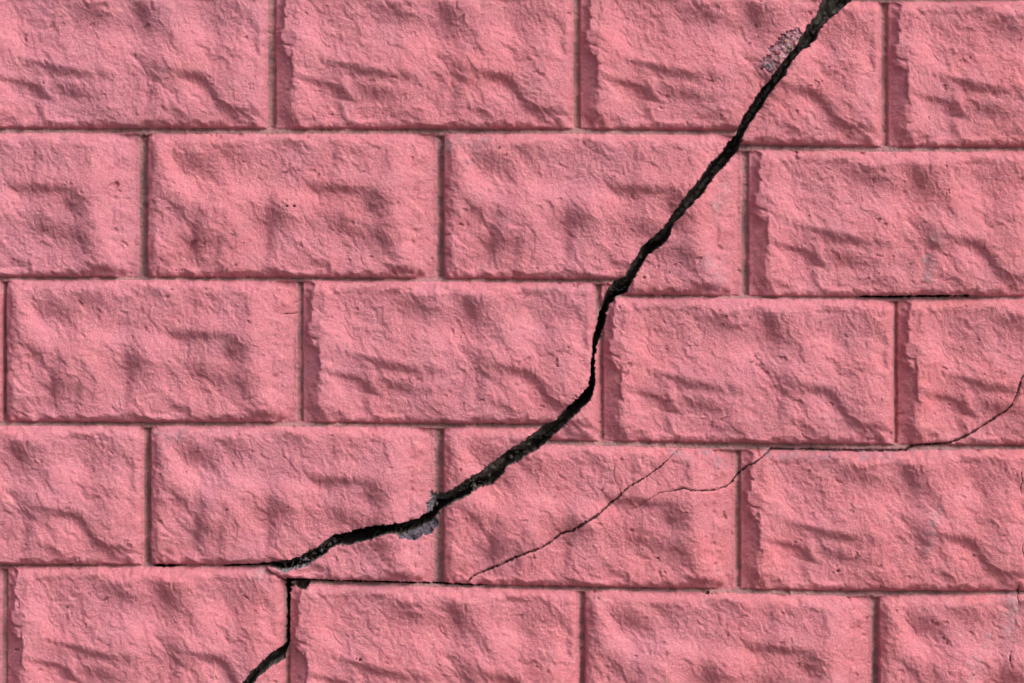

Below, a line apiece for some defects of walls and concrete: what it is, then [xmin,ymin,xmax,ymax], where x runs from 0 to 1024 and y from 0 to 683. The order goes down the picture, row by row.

spalling [760,24,803,74]
crack [224,0,1024,683]
spalling [399,491,444,540]
crack [149,562,186,570]